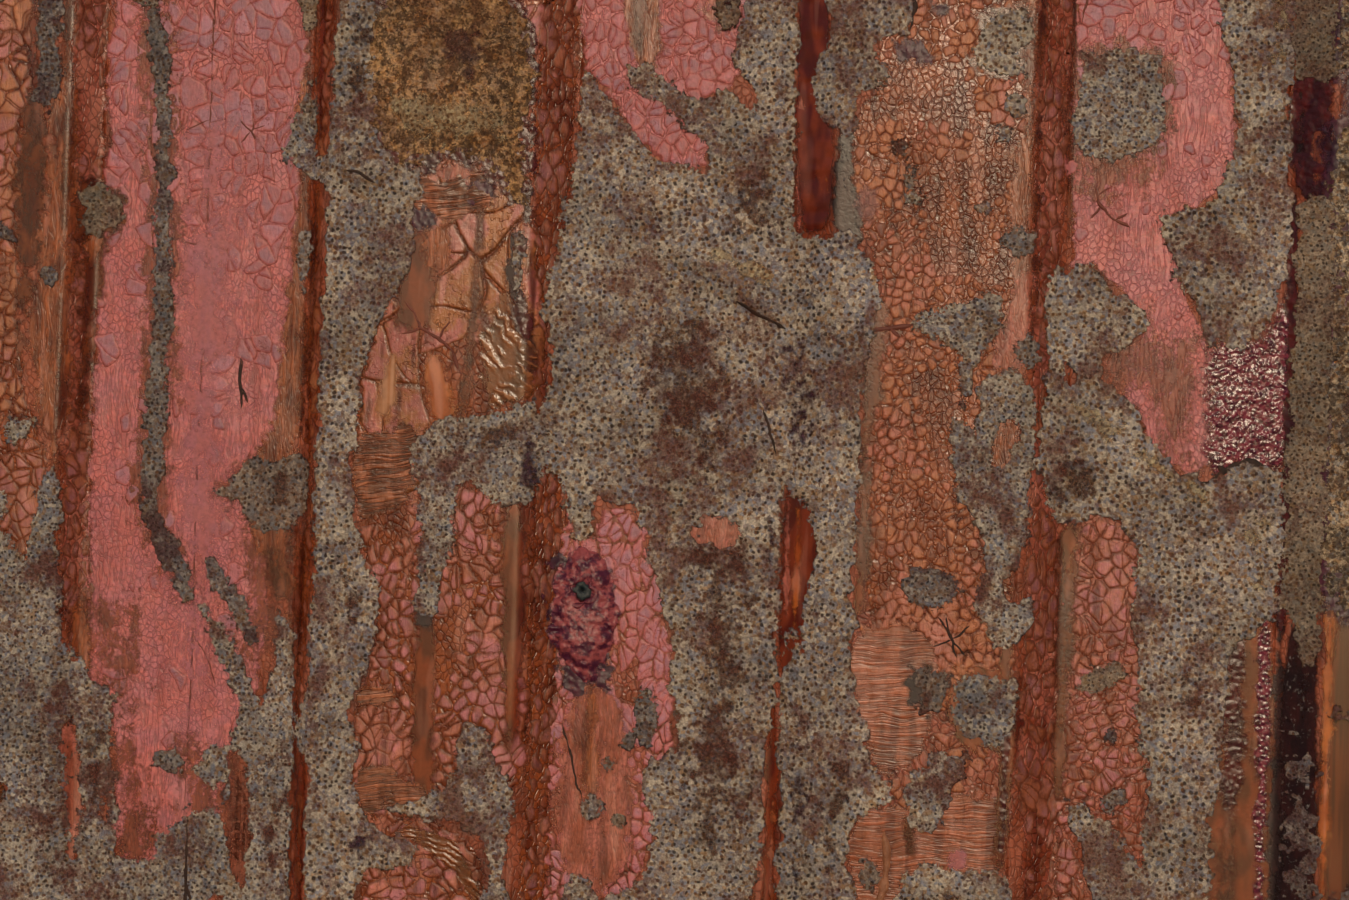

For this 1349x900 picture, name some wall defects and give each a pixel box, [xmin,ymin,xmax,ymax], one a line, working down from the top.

crack [0,0,339,900]
peeling [0,0,541,900]
crack [351,0,746,900]
peeling [407,0,1022,900]
corrosion [815,762,849,820]
corrosion [826,795,1007,900]
crack [848,0,1274,900]
peeling [901,0,1349,900]
corrosion [1182,673,1200,709]
corrosion [1201,0,1349,631]
corrosion [1317,515,1349,900]